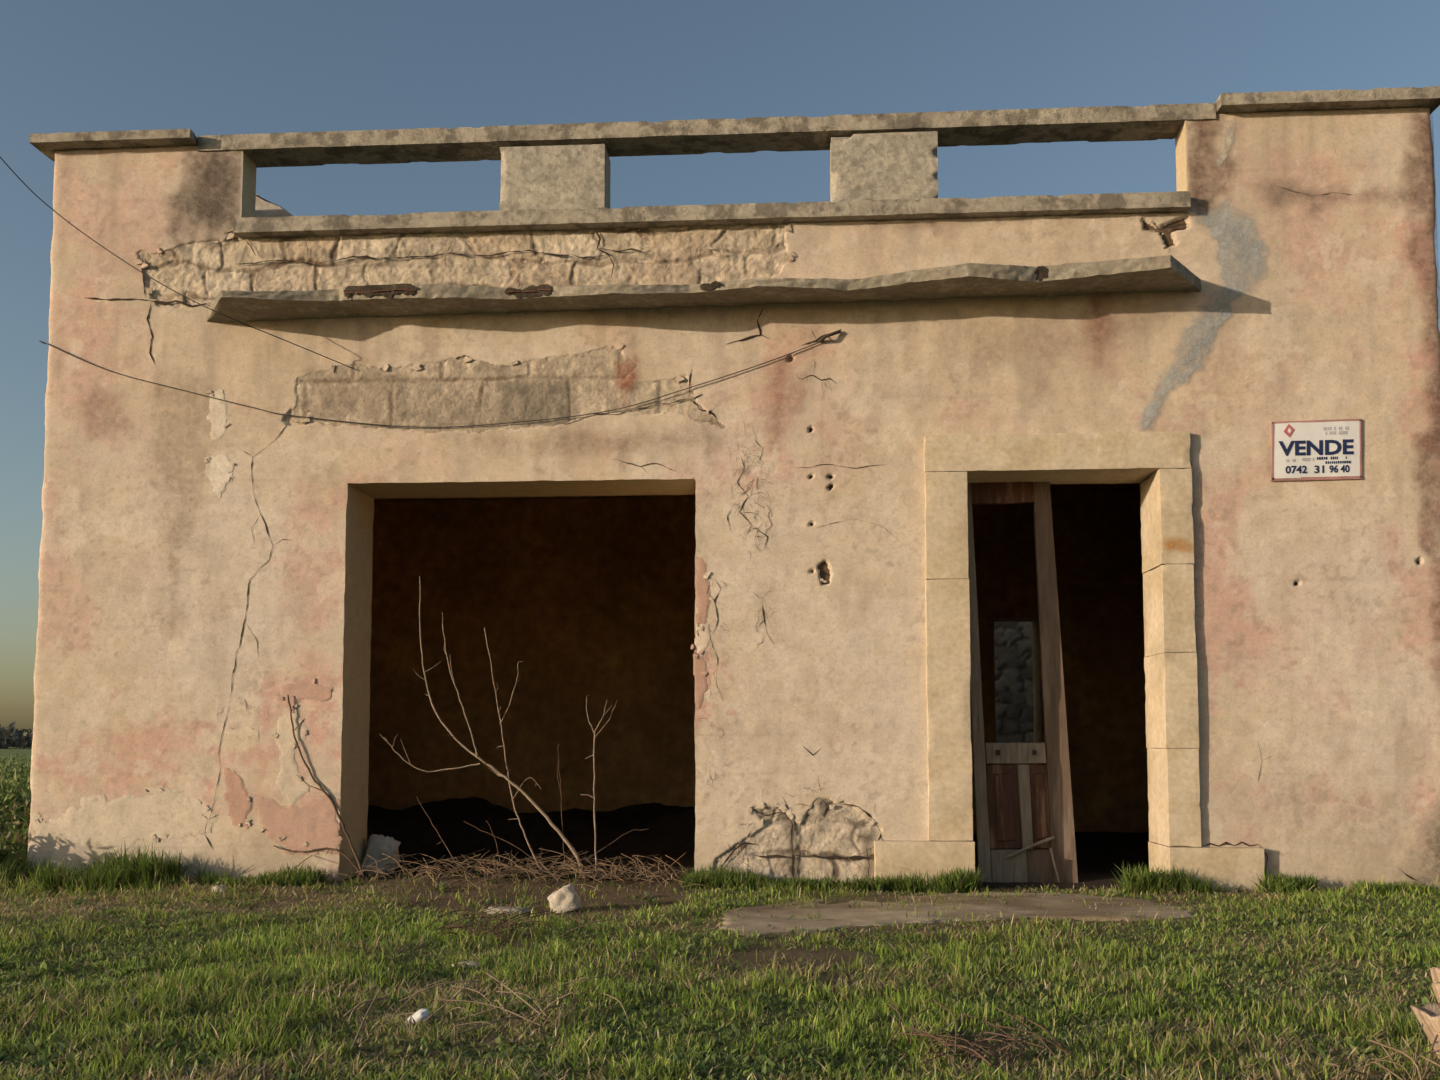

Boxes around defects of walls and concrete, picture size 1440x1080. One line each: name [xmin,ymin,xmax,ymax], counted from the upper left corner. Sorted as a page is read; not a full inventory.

spalling [255,194,293,217]
crack [1272,185,1351,200]
crack [89,228,773,362]
flaking render [136,223,796,308]
flaking render [291,341,726,434]
crack [798,329,842,404]
crack [565,373,888,559]
flaking render [816,562,830,584]
crack [202,421,292,849]
peeling [31,678,342,855]
flaking render [714,798,881,884]
crack [1204,841,1268,875]